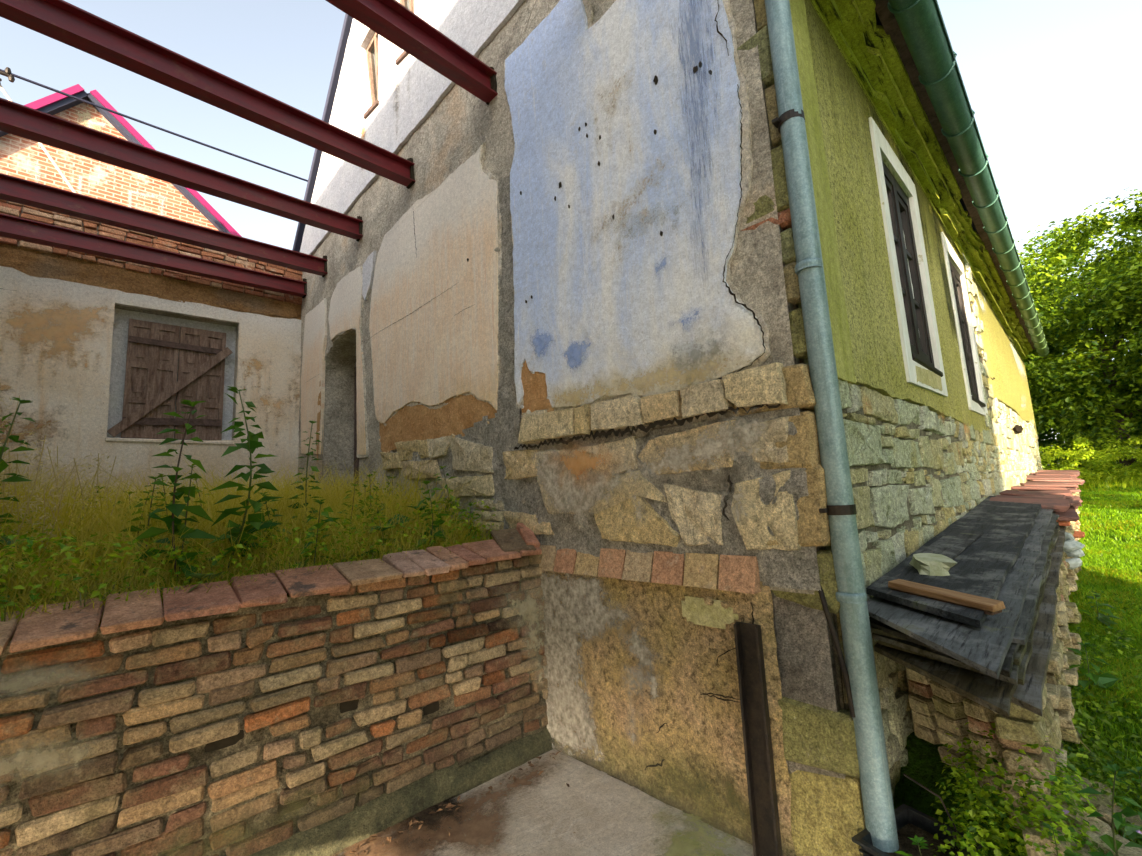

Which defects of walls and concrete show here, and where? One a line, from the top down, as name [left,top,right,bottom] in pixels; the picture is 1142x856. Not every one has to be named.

leakage [679,0,713,176]
spalling [378,174,554,453]
peeling [565,341,590,367]
leakage [918,199,957,337]
leakage [342,762,556,856]